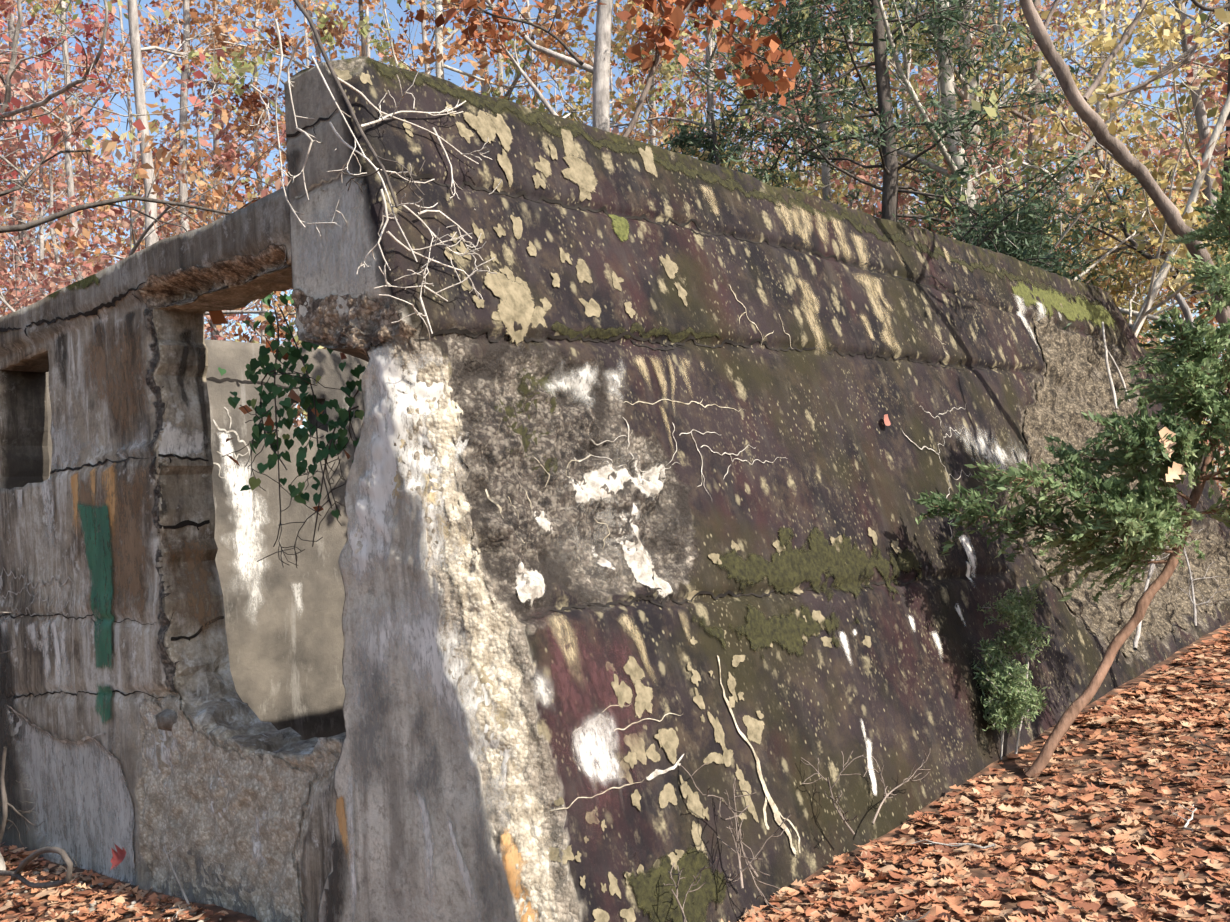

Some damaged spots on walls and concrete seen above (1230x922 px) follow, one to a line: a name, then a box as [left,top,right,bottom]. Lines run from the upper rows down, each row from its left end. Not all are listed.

damp [635,358,688,432]
spalling [9,244,338,922]
crack [156,520,210,530]
damp [485,489,554,606]
damp [566,454,673,597]
crack [0,613,224,641]
spalling [414,361,671,922]
crack [3,690,181,701]
damp [646,754,684,780]
damp [861,722,876,794]
rust [336,796,350,855]
rust [501,830,538,922]